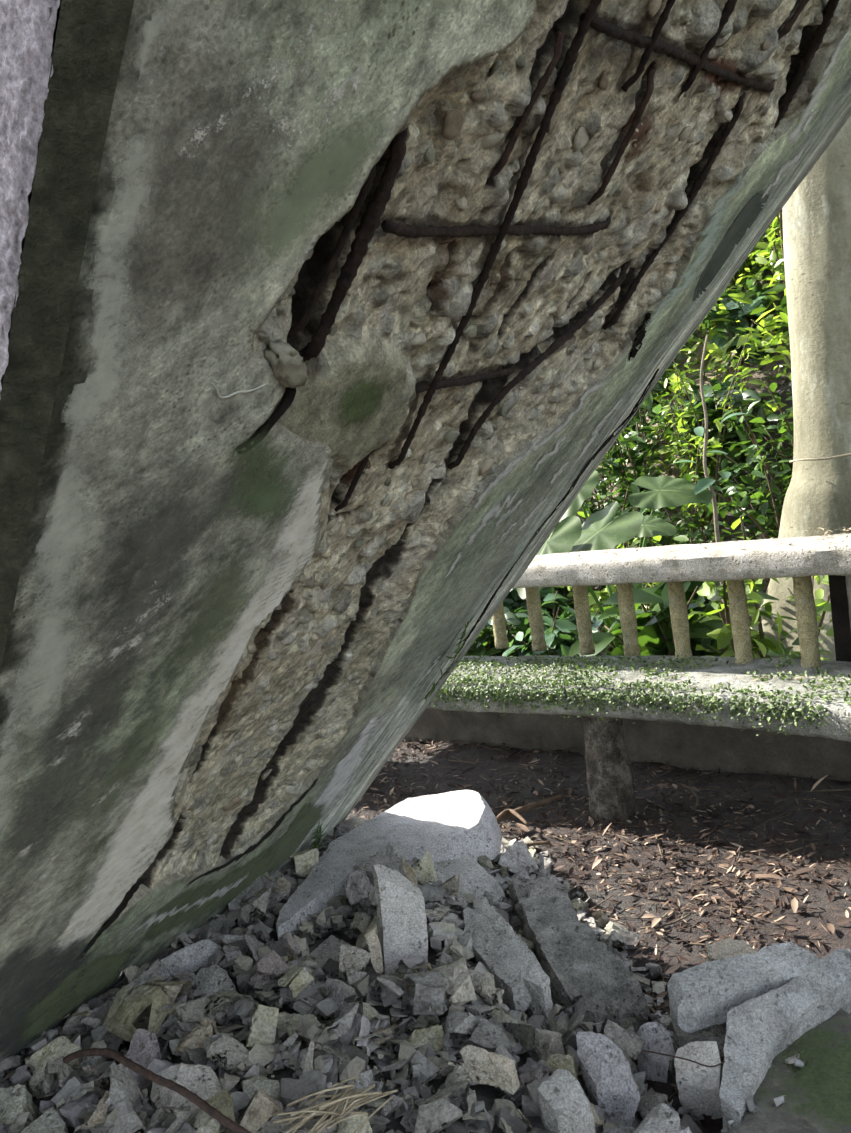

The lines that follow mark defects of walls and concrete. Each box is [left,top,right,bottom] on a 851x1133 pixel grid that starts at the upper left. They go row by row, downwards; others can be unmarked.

water stain [0,138,226,868]
efflorescence [138,0,178,84]
spalling [137,0,851,889]
corrosion [287,0,839,470]
water stain [0,460,328,1060]
crack [188,778,319,885]
water stain [313,717,378,823]